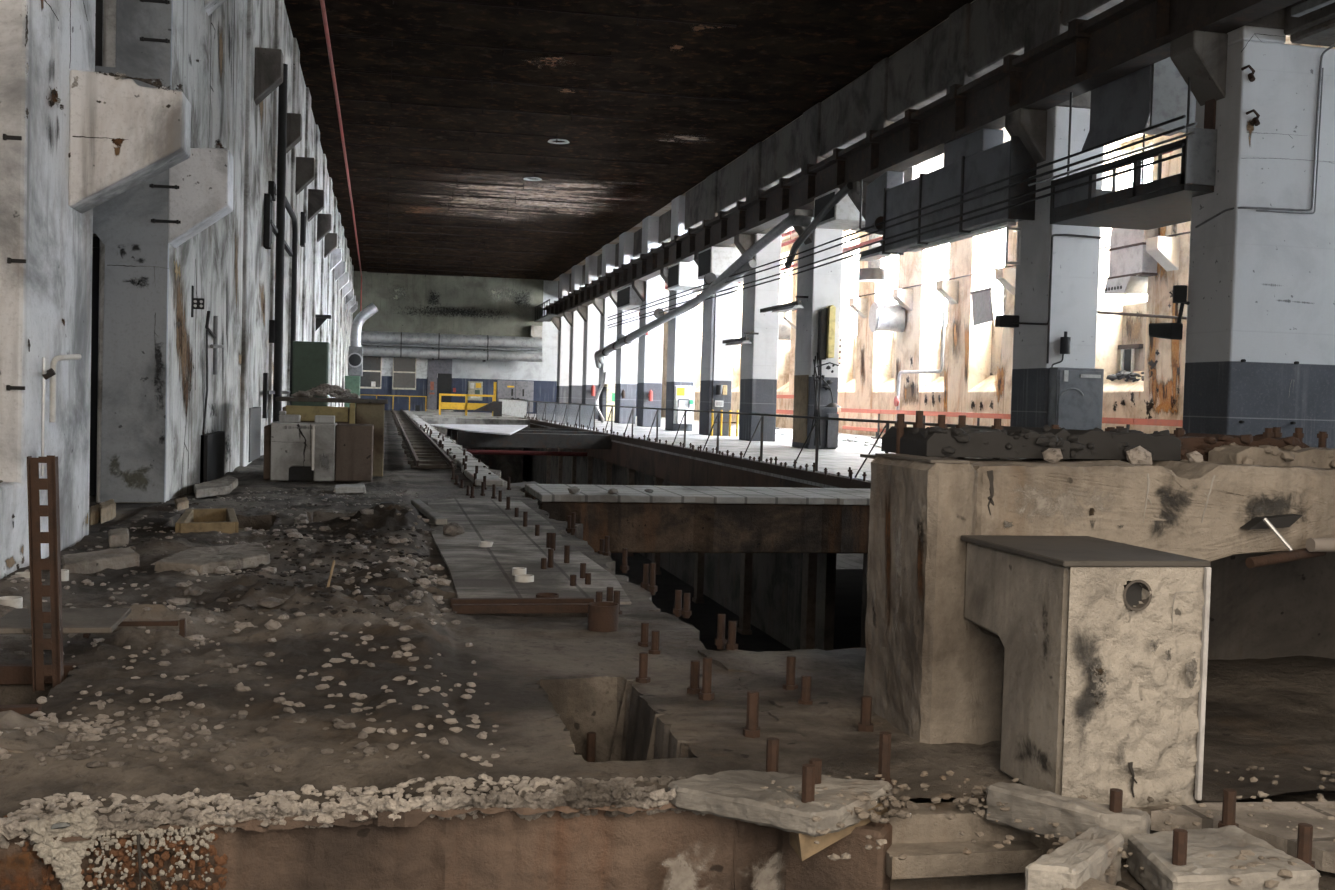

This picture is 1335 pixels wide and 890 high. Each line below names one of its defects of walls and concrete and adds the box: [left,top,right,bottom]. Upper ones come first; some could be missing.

rust [173,260,194,415]
rust [1147,322,1181,414]
damp [1076,629,1104,741]